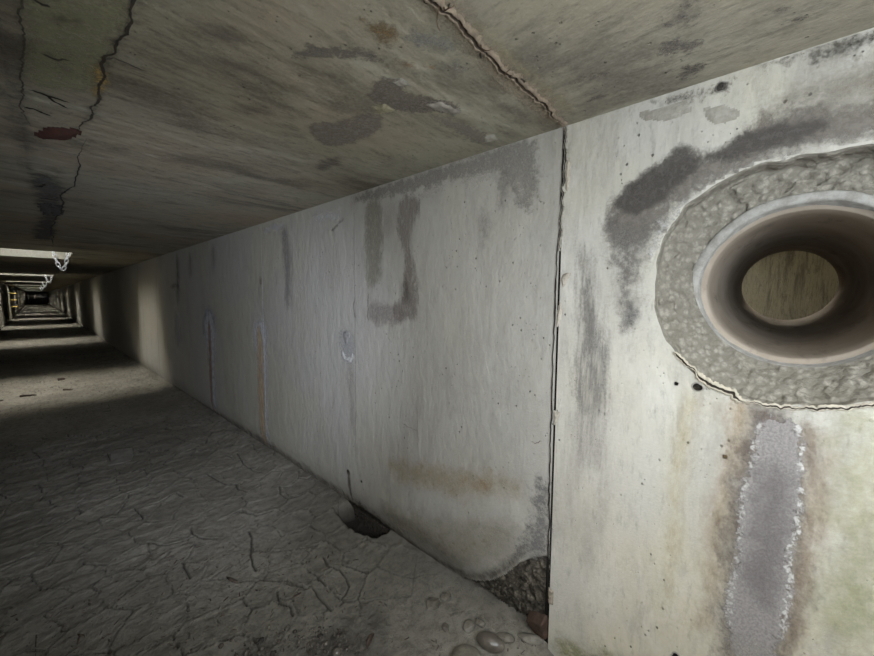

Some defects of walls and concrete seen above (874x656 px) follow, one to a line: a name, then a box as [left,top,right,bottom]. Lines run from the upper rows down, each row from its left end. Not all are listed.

crack [16,0,69,124]
rust [34,126,82,140]
crack [50,0,144,247]
damp [355,140,538,322]
crack [422,0,593,617]
damp [606,103,874,325]
spalling [472,556,549,640]
damp [721,409,810,656]